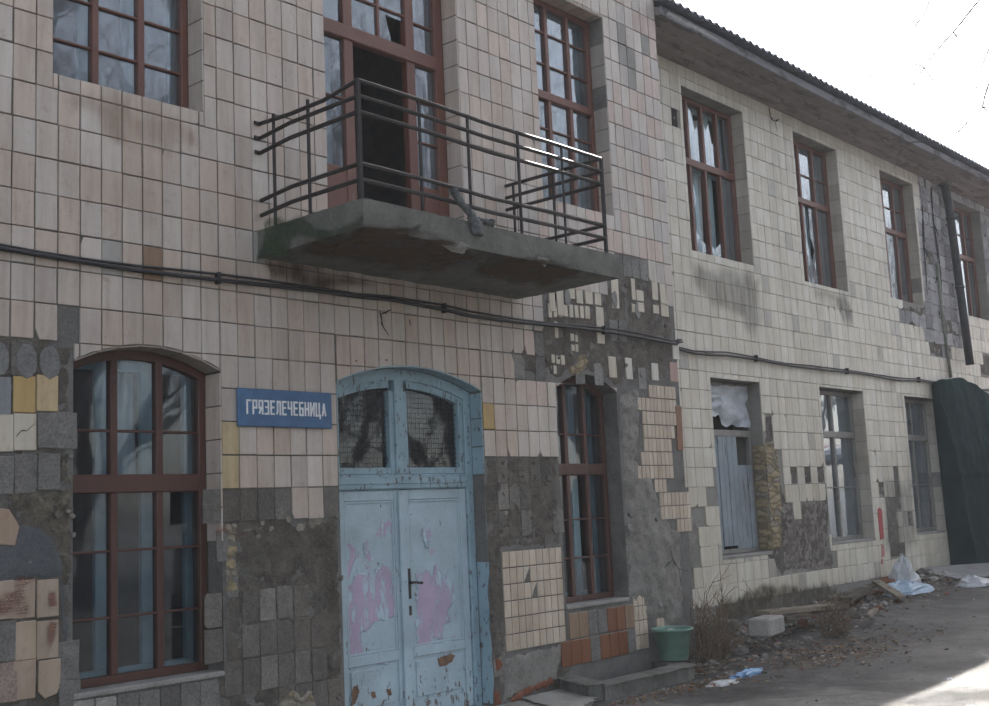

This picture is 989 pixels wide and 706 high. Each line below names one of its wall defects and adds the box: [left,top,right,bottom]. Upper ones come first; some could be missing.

peeling [513,254,672,390]
peeling [897,176,989,359]
peeling [0,338,76,643]
peeling [752,416,833,576]
peeling [0,657,59,706]
peeling [202,488,374,706]
peeling [414,564,456,667]